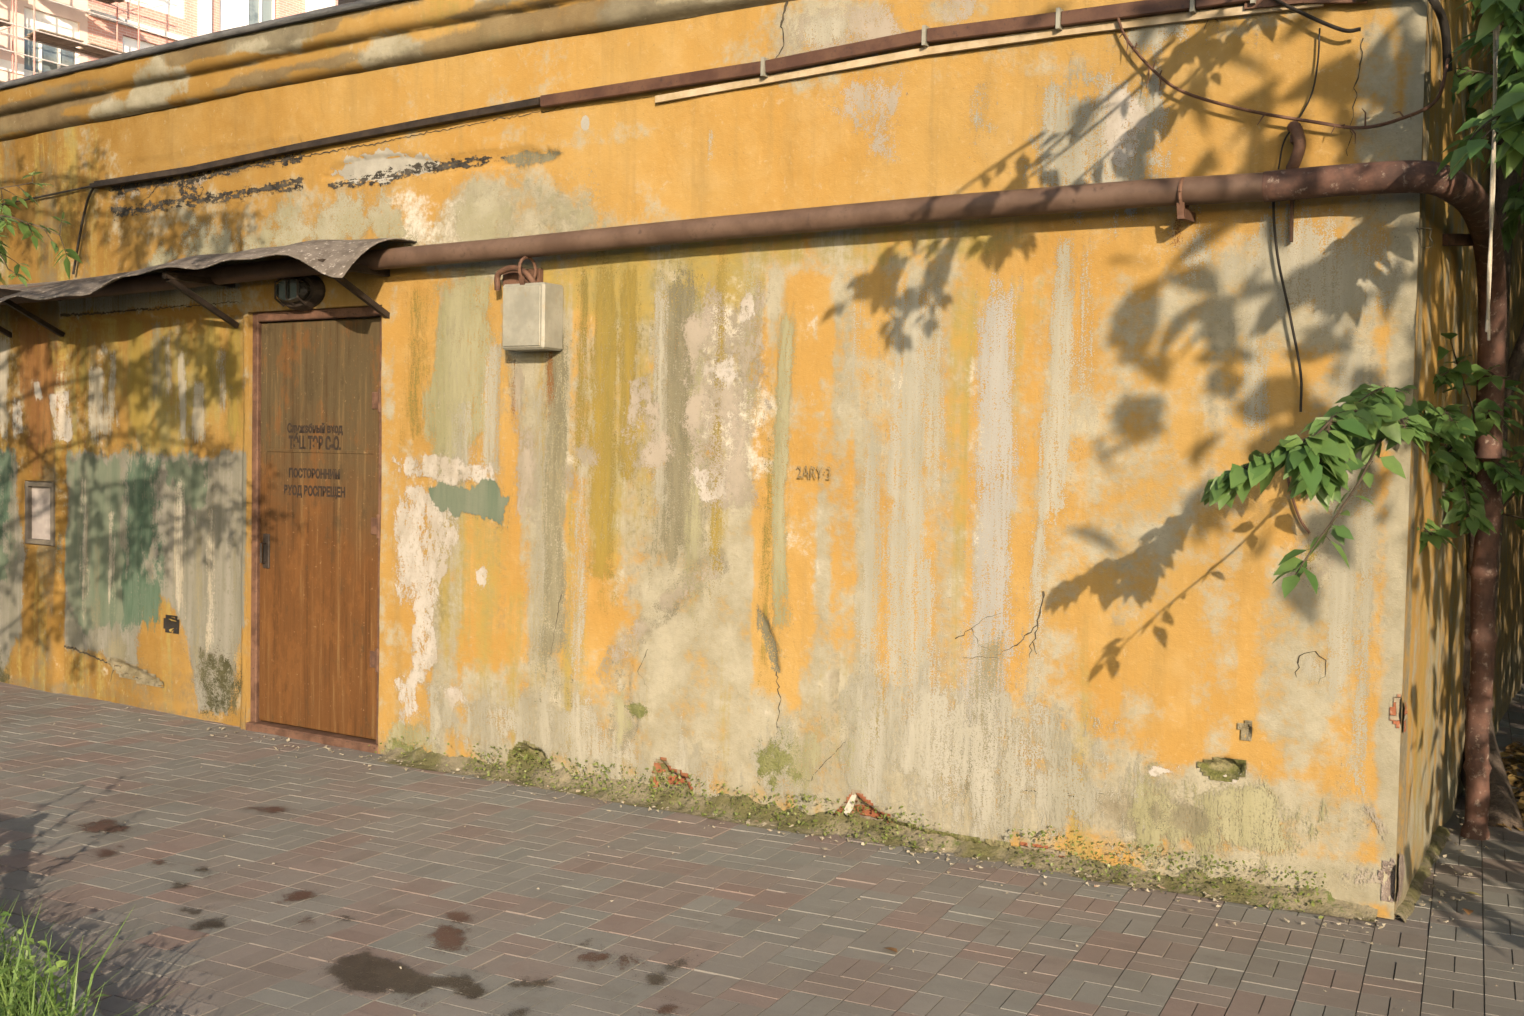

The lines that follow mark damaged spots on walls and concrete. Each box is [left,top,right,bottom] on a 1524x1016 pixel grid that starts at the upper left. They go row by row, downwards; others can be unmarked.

flaking render [107,140,304,222]
flaking render [326,145,562,190]
damp [964,48,1188,187]
damp [58,163,635,450]
damp [0,331,15,454]
peeling [615,275,772,517]
damp [171,473,240,700]
peeling [392,364,540,725]
damp [398,195,1417,868]
crack [955,591,1045,659]
flaking render [1149,757,1251,785]
flaking render [1238,720,1252,741]